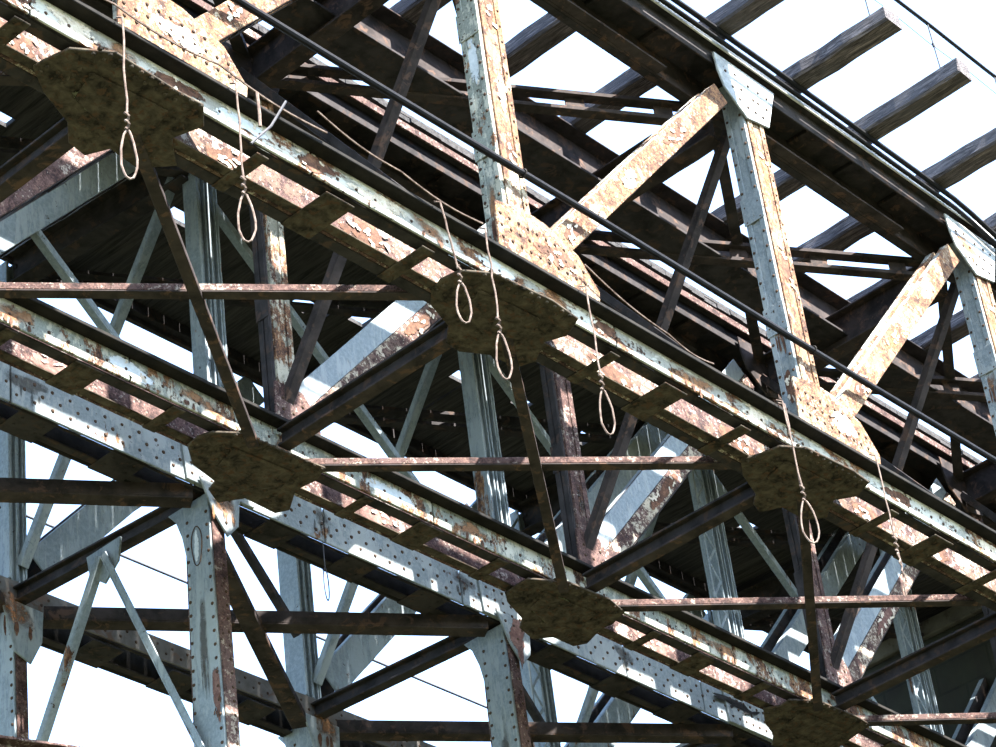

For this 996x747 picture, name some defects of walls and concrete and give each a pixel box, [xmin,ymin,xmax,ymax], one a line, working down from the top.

rust [219,2,250,25]
peeling [152,14,205,54]
peeling [474,252,515,281]
rust [0,305,34,332]
rust [30,352,67,374]
rust [784,370,795,404]
rust [854,374,871,399]
peeling [831,410,858,438]
rust [719,425,754,455]
rust [212,499,235,526]
rust [360,506,398,527]
rust [212,667,221,722]